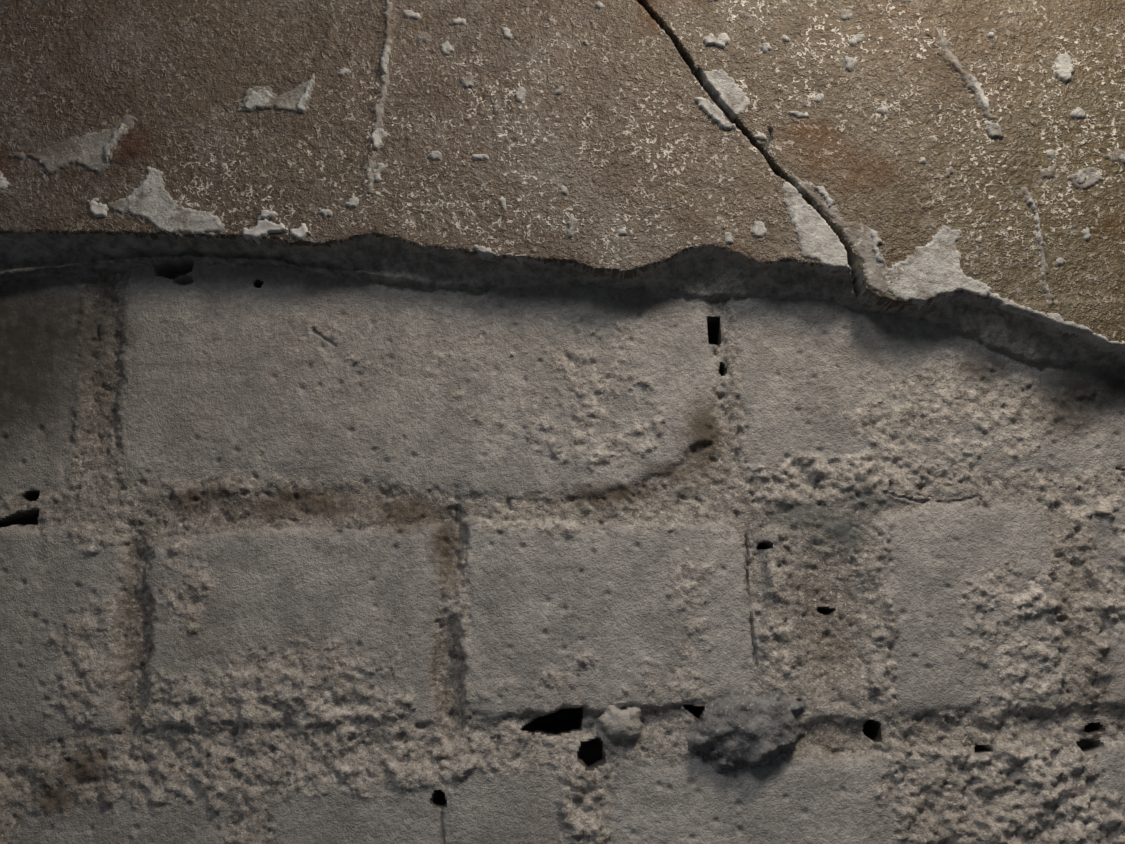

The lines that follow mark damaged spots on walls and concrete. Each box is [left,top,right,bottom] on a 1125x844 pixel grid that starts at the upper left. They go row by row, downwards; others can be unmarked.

peeling [703,33,730,48]
peeling [760,34,790,53]
peeling [844,34,865,71]
peeling [236,73,315,114]
peeling [695,69,750,130]
peeling [787,93,824,118]
peeling [1070,107,1086,119]
peeling [9,115,138,175]
crack [635,0,866,298]
spalling [0,171,1125,844]